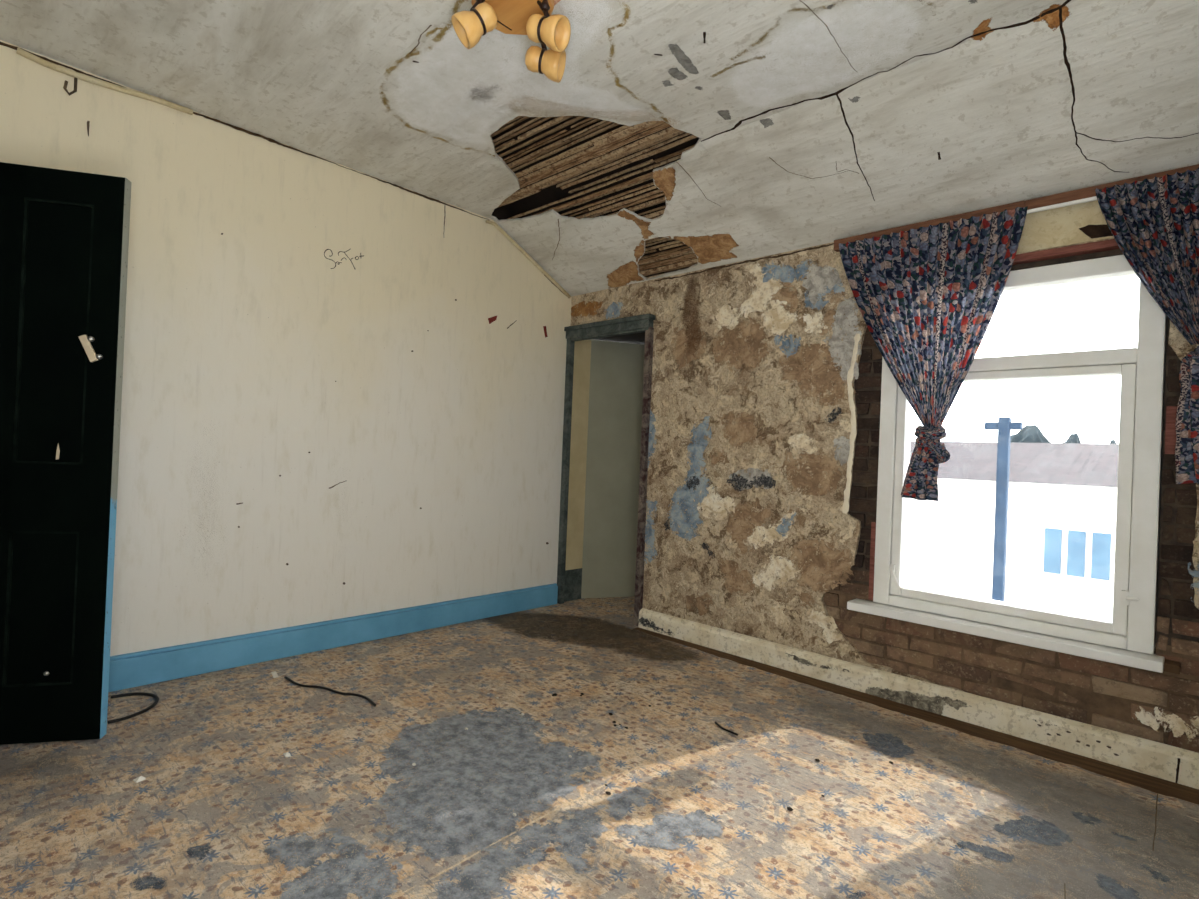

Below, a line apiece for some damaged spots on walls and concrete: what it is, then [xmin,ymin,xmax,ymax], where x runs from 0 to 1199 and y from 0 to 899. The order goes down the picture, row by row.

water stain [380,0,679,157]
crack [701,0,1198,201]
spalling [491,116,739,288]
peeling [1010,200,1123,271]
flaking render [671,259,1199,756]